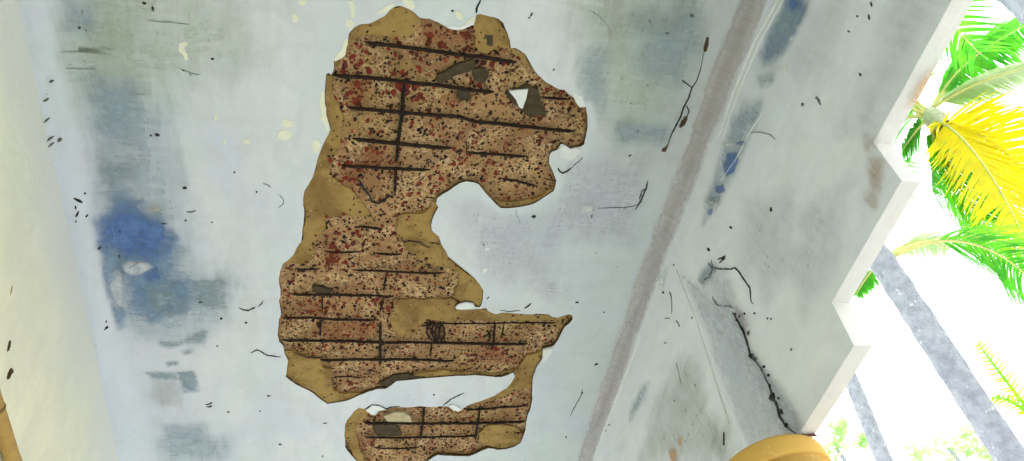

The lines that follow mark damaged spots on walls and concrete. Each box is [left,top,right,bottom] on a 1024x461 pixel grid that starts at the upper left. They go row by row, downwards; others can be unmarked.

leakage [102,89,223,326]
spalling [278,0,588,461]
crack [662,37,709,152]
crack [704,256,817,436]